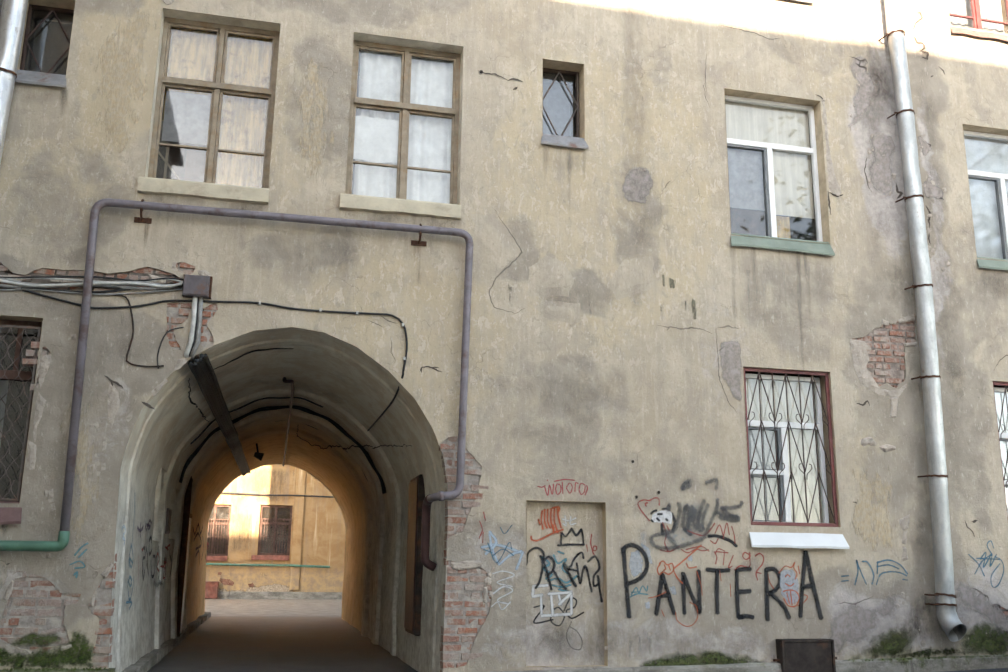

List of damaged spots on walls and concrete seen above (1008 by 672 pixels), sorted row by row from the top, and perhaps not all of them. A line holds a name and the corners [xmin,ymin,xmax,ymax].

crack [480,71,523,90]
water stain [851,57,889,122]
flaking render [0,262,211,290]
crack [489,214,525,314]
flaking render [22,341,52,471]
flaking render [166,303,218,370]
flaking render [850,314,917,418]
flaking render [438,436,503,672]
flaking render [0,553,117,668]